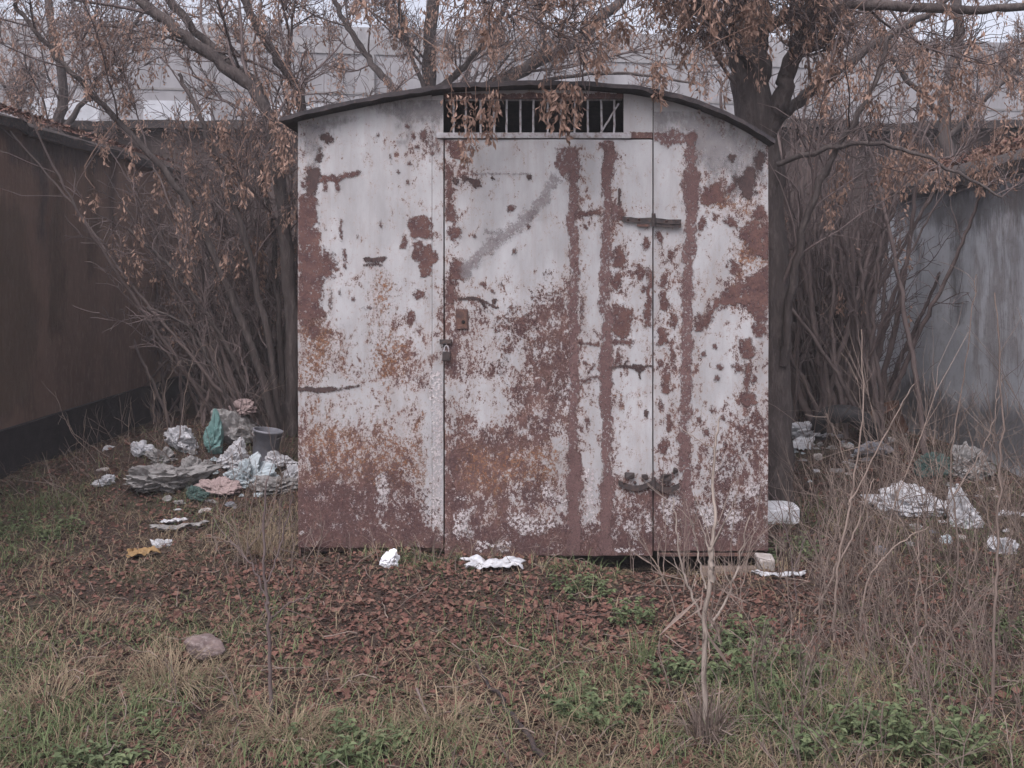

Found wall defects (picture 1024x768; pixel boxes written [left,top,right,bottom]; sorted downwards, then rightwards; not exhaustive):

corrosion [298,127,768,555]